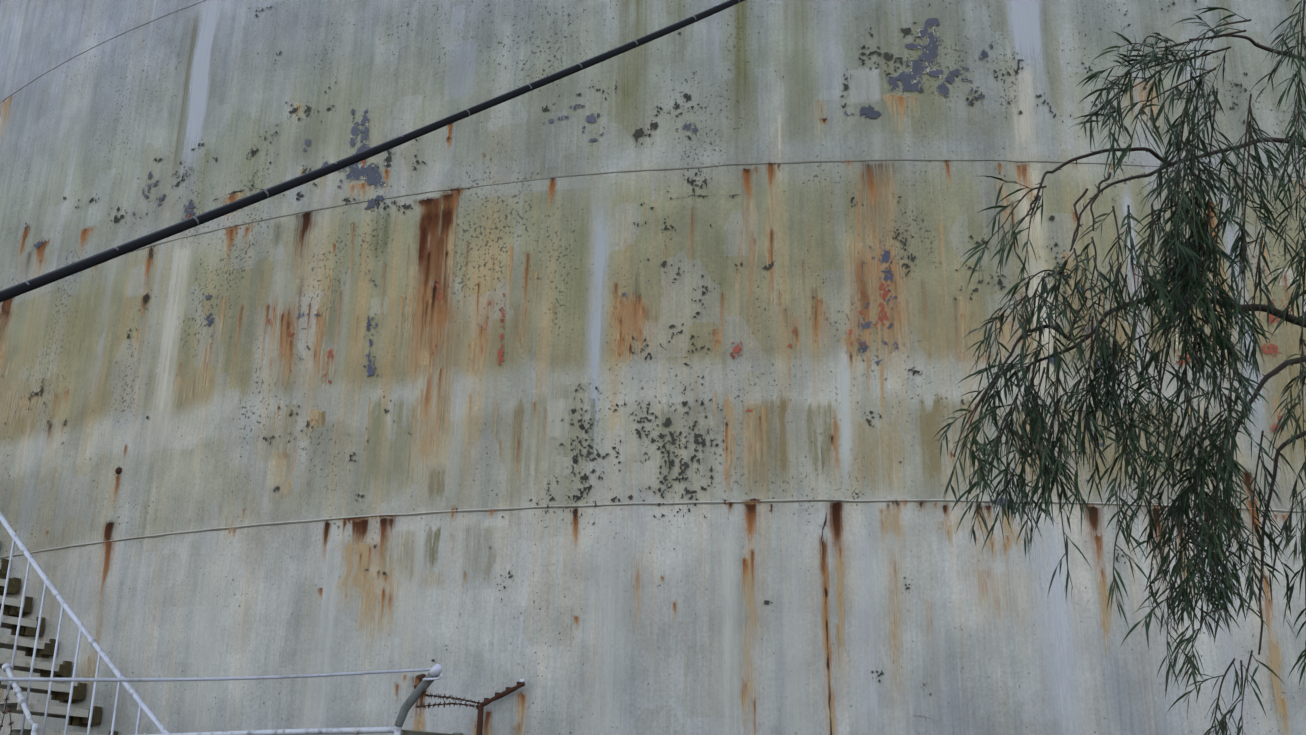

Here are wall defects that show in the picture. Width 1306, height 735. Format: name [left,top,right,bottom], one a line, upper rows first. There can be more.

peeling [63,139,217,228]
peeling [243,75,415,216]
peeling [840,0,1071,122]
peeling [1174,72,1253,125]
rust [399,188,468,468]
rust [847,220,906,411]
rust [100,522,114,594]
rust [323,515,393,626]
rust [723,499,772,632]
rust [831,502,845,673]
rust [1084,503,1111,635]
rust [1263,570,1288,735]